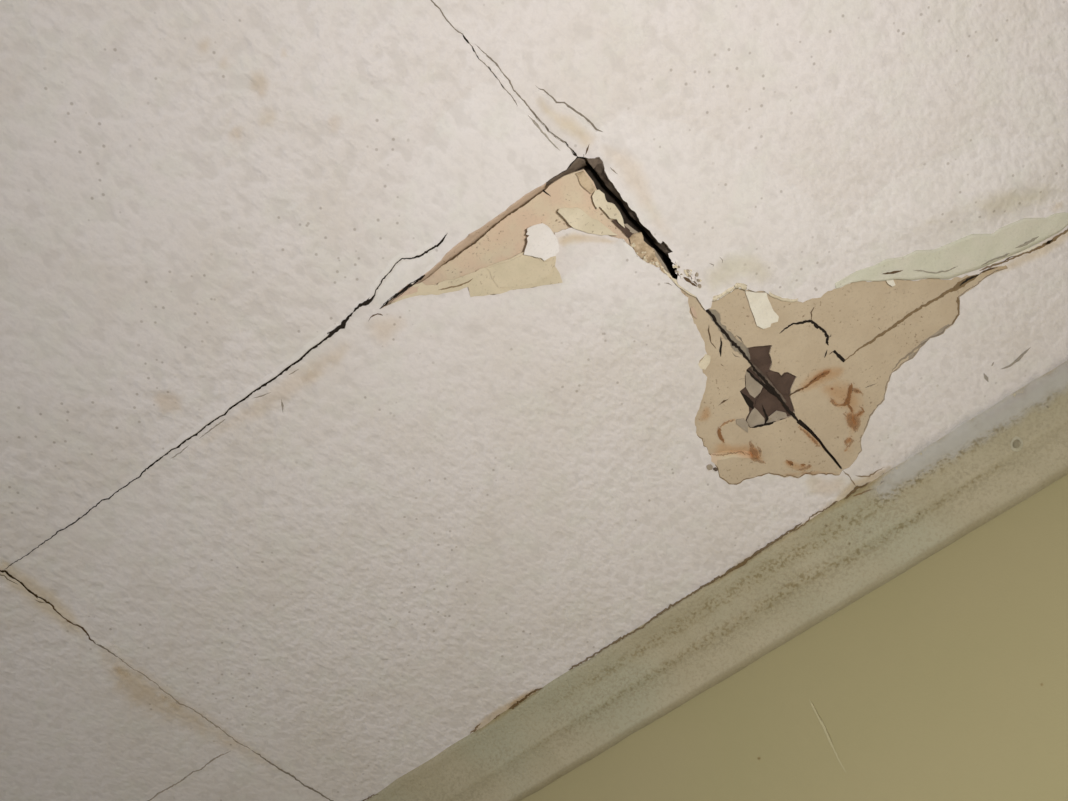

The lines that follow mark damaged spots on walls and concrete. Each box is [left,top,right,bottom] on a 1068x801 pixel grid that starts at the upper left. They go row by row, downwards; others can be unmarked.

crack [431,0,603,158]
crack [0,231,447,801]
peeling [381,157,1068,485]
crack [569,229,1068,670]
rust [841,383,865,415]
crack [470,688,542,734]